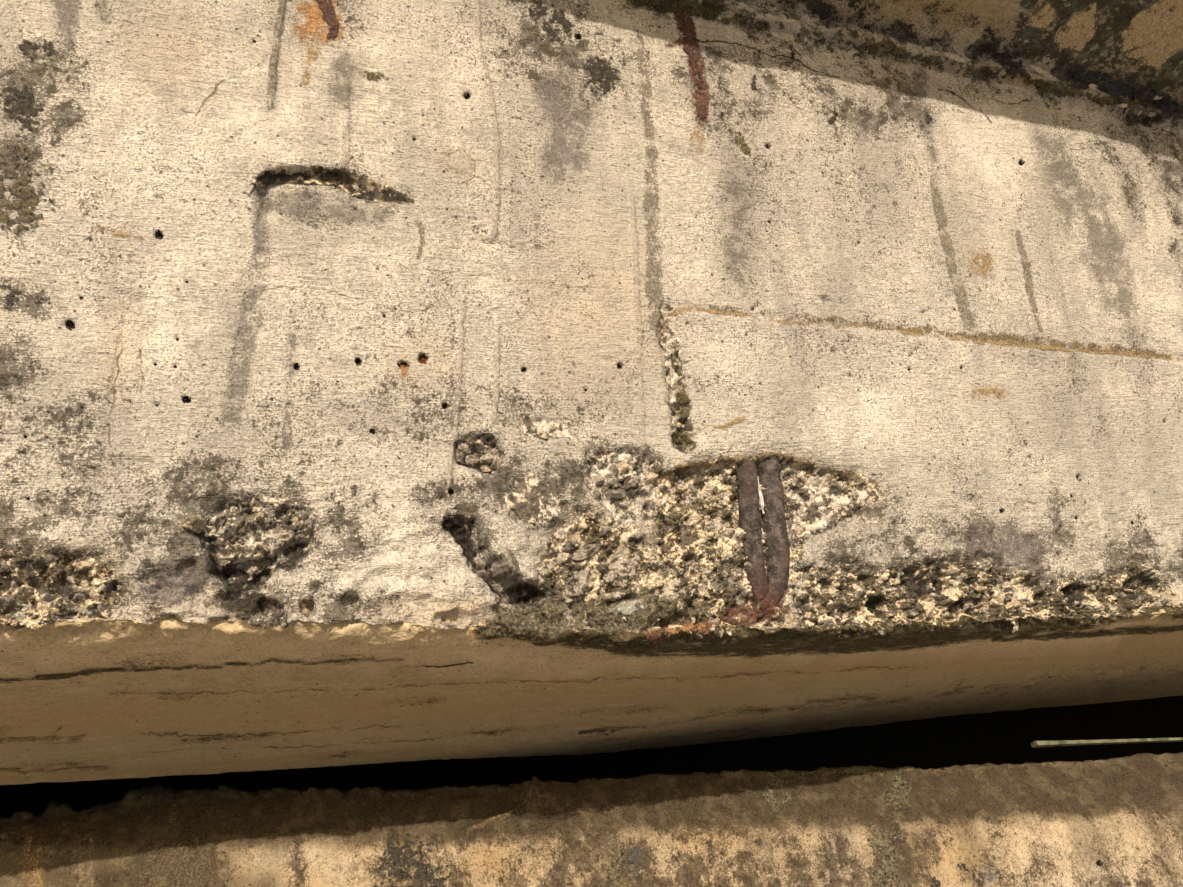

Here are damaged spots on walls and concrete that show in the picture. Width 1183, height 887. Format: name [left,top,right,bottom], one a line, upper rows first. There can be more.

rust [293,0,345,85]
rust [664,12,709,152]
spalling [253,164,414,202]
water stain [636,29,664,333]
water stain [1015,230,1043,332]
water stain [1039,136,1135,333]
spalling [0,543,128,631]
water stain [138,565,204,606]
spalling [181,495,319,617]
spalling [443,449,1180,639]
water stain [946,521,1047,568]
water stain [130,838,229,887]